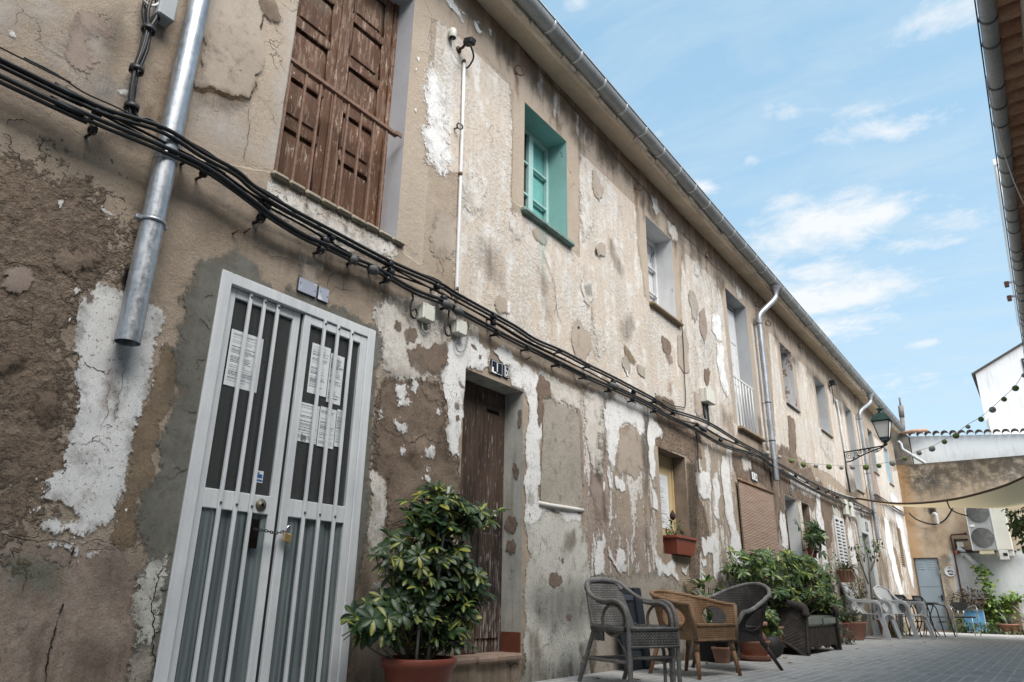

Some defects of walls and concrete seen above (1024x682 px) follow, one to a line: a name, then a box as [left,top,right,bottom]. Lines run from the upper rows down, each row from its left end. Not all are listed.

peeling [415,57,452,177]
flaking render [595,242,606,258]
peeling [651,196,679,241]
flaking render [661,335,673,364]
peeling [30,267,177,563]
crack [83,363,124,468]
flaking render [366,293,663,575]
flaking render [549,557,564,587]
crack [45,603,64,682]